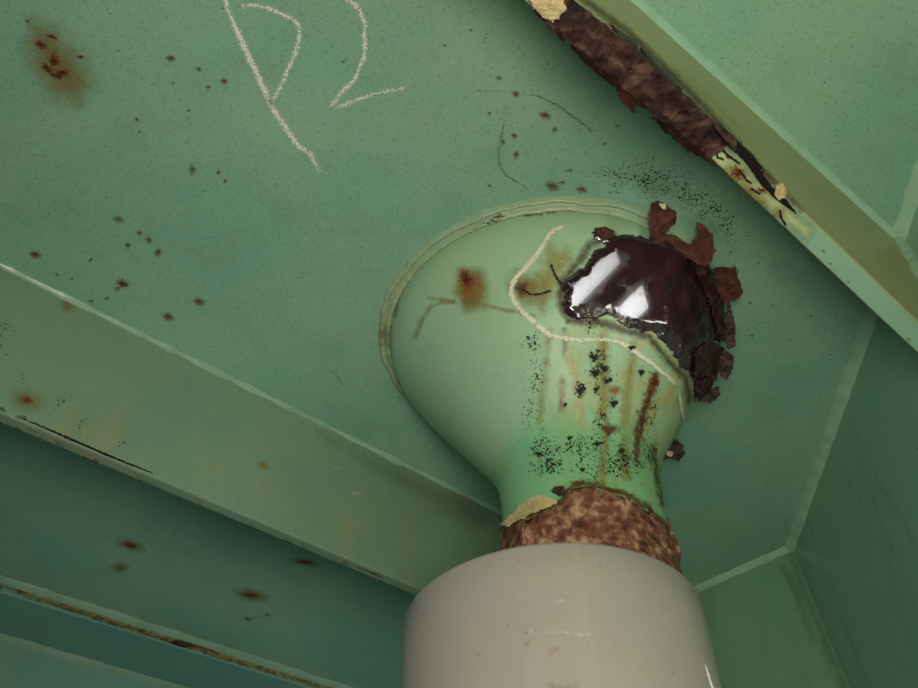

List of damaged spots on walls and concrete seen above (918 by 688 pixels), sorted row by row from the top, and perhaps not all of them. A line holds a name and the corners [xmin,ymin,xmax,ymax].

corrosion [33,34,84,91]
corrosion [529,0,737,166]
peeling [585,0,813,240]
corrosion [458,269,486,309]
corrosion [514,154,749,463]
corrosion [499,372,686,574]
corrosion [170,639,220,653]